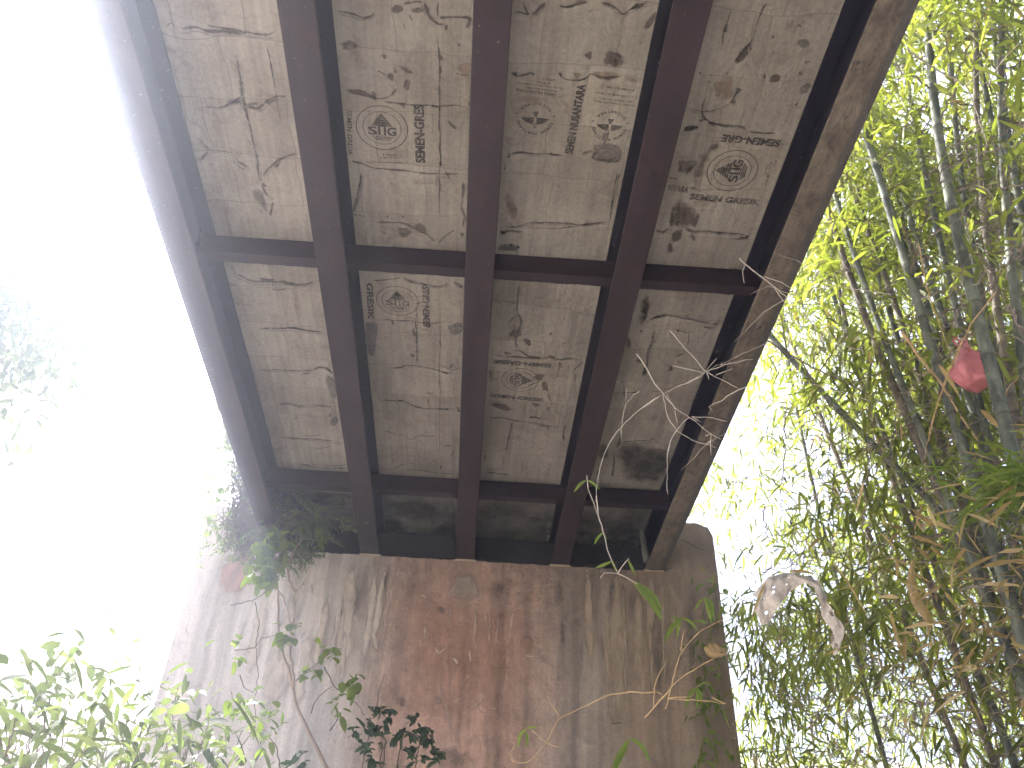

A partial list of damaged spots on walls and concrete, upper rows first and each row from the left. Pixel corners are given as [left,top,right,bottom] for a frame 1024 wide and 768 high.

water stain [621,446,667,480]
water stain [246,572,395,702]
water stain [585,575,666,717]